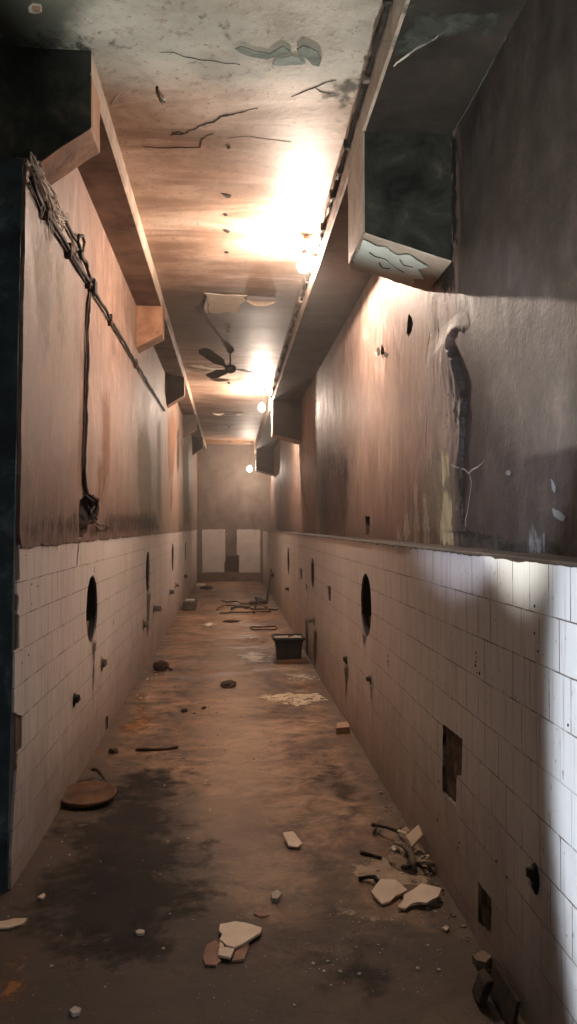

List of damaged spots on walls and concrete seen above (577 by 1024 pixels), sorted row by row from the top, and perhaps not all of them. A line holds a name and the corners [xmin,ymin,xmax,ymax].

crack [159,52,240,65]
spalling [235,45,321,66]
crack [150,108,288,149]
peeling [350,239,428,285]
peeling [204,293,275,314]
peeling [438,724,463,803]
flaking render [373,872,492,972]